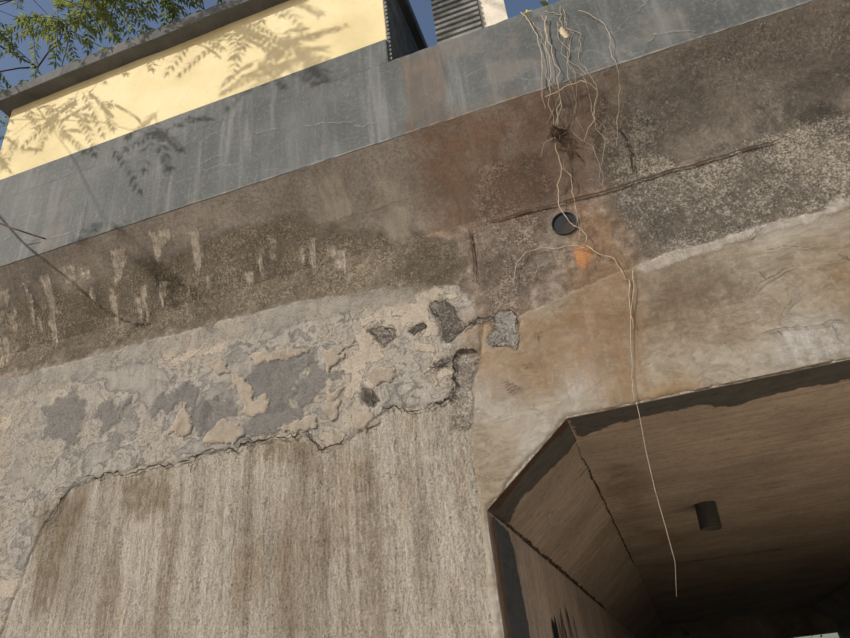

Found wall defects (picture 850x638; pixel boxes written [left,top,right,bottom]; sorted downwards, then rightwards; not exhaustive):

crack [469,128,790,282]
water stain [0,177,466,395]
flaking render [41,390,86,449]
flaking render [95,398,131,436]
flaking render [148,338,354,445]
flaking render [351,365,397,432]
spalling [367,326,396,347]
crack [379,316,492,415]
spalling [433,351,480,430]
crack [43,431,353,527]
crack [574,439,809,567]
crack [494,514,606,610]